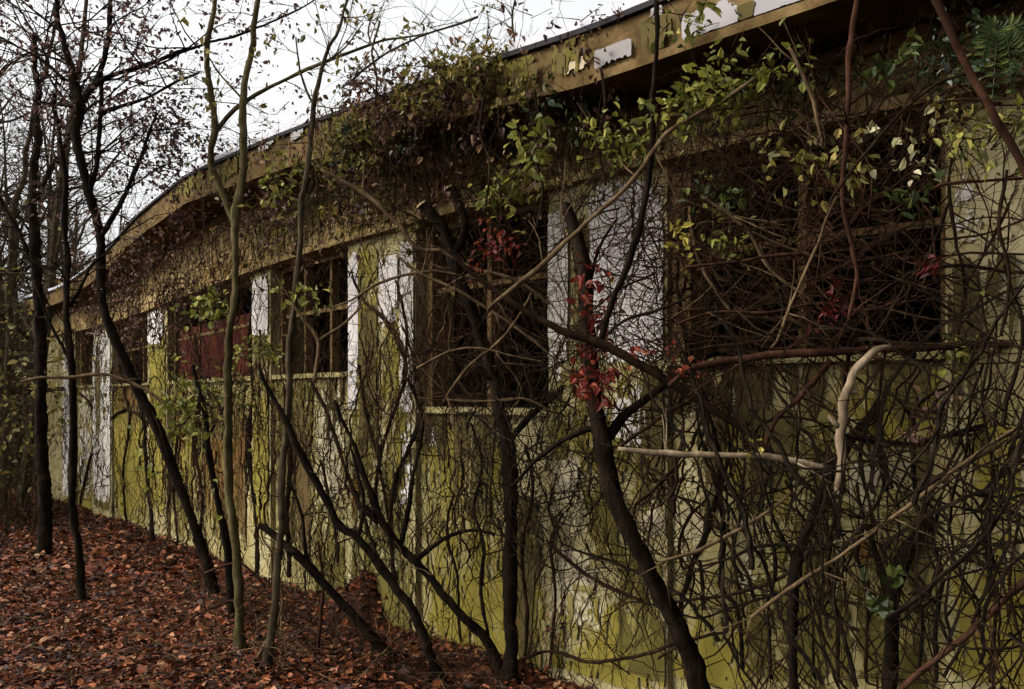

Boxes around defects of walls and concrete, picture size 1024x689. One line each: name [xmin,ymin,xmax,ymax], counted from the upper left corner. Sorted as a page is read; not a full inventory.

peeling [681,0,738,40]
peeling [753,0,799,16]
peeling [563,38,631,74]